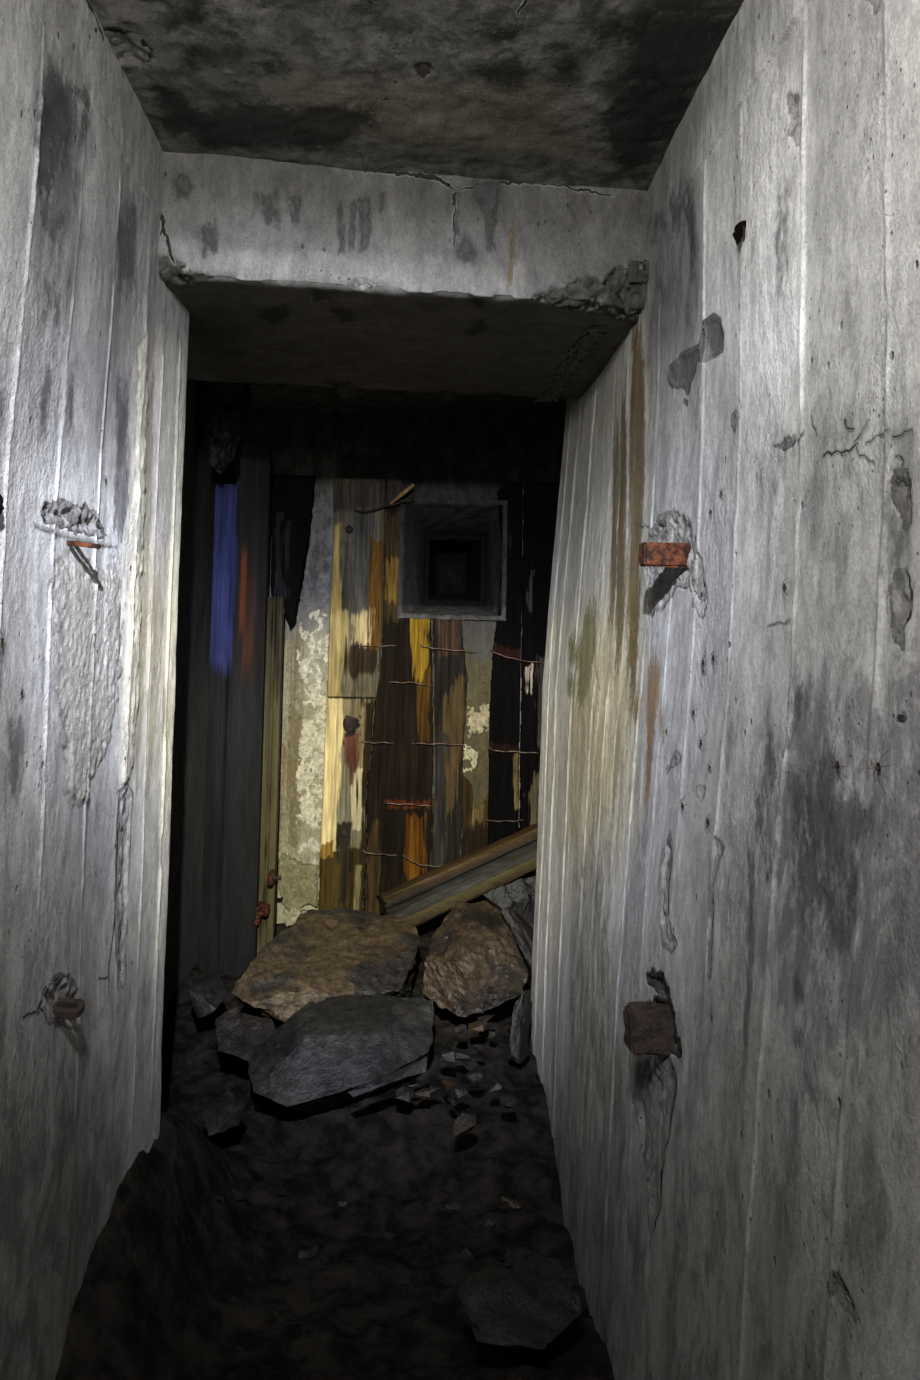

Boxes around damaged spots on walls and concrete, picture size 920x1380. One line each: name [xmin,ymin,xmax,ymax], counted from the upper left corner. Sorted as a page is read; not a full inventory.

water stain [153,84,376,150]
crack [159,210,176,266]
water stain [337,193,384,254]
spalling [533,260,649,325]
peeling [667,313,724,407]
crack [773,414,913,471]
spalling [41,496,106,539]
spalling [645,508,708,619]
peeling [277,549,332,926]
spalling [659,833,677,954]
spalling [40,973,83,1031]
spalling [632,967,682,1234]